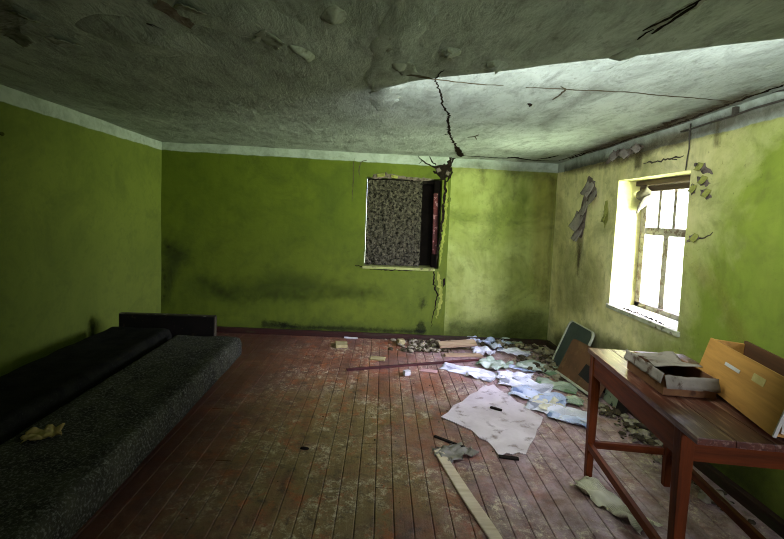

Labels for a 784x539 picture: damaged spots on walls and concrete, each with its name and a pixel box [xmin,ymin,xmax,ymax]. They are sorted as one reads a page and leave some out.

spalling [0,0,50,48]
peeling [153,0,209,30]
crack [637,0,707,40]
crack [526,81,784,133]
crack [643,155,684,164]
crack [355,71,593,326]
peeling [568,176,597,242]
peeling [600,200,608,228]
peeling [687,162,713,200]